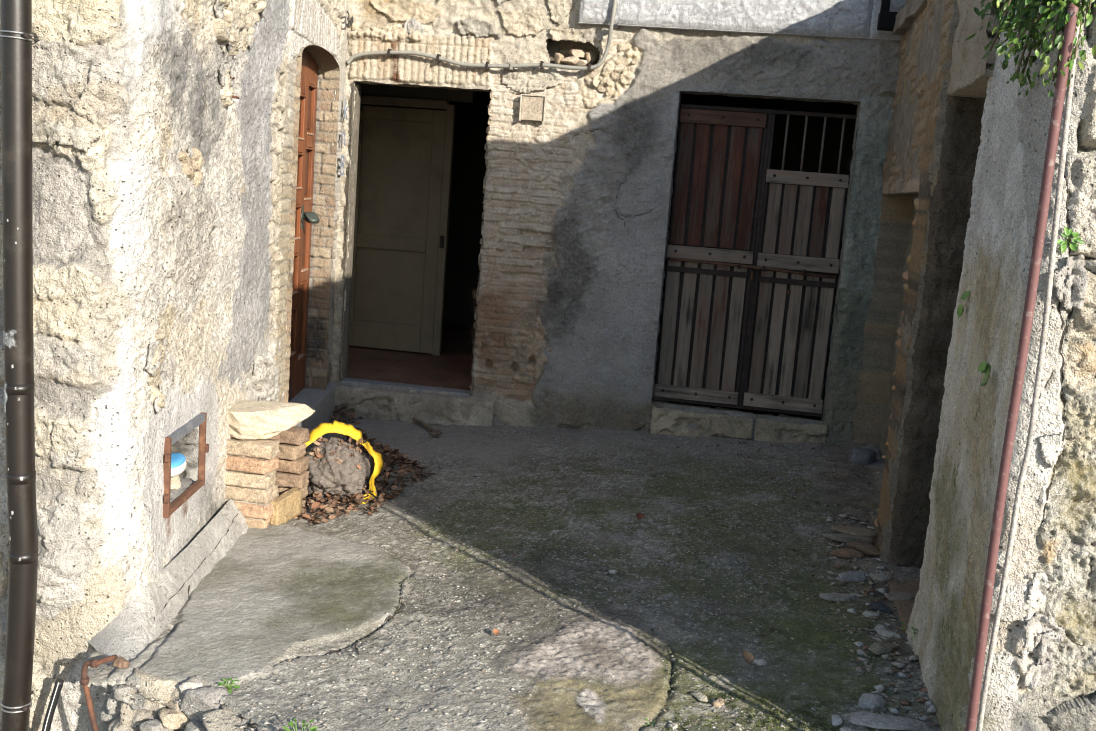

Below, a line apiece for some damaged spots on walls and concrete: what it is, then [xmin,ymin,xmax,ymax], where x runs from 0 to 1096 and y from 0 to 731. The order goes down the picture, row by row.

spalling [347,0,442,43]
peeling [456,0,640,97]
crack [1064,164,1096,275]
spalling [504,309,552,388]
crack [1041,302,1094,525]
crack [325,578,407,655]